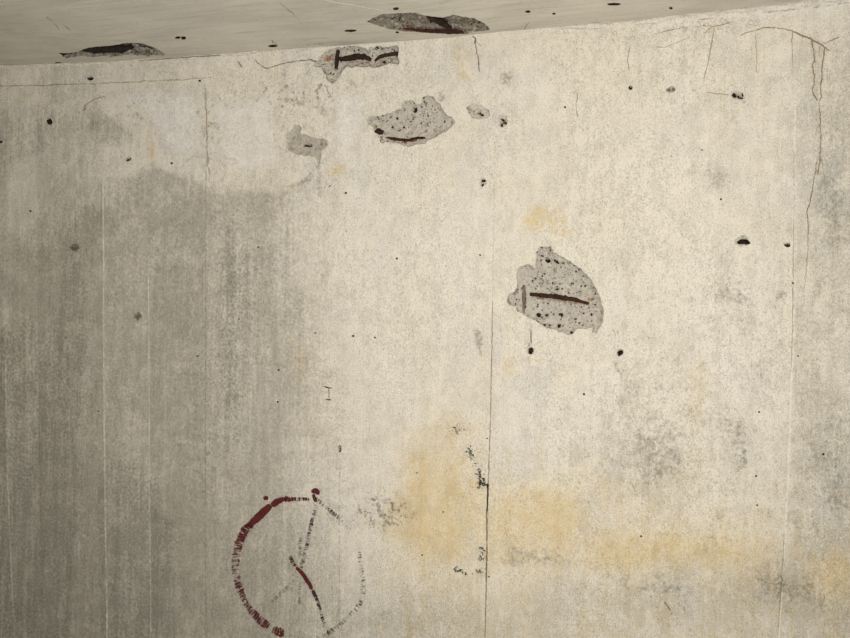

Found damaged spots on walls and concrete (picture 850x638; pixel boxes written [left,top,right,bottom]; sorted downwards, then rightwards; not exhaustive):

spalling [367,7,490,34]
spalling [55,43,165,63]
spalling [314,45,399,84]
spalling [367,95,455,147]
crack [703,22,839,287]
spalling [507,246,604,335]
crack [481,302,493,632]